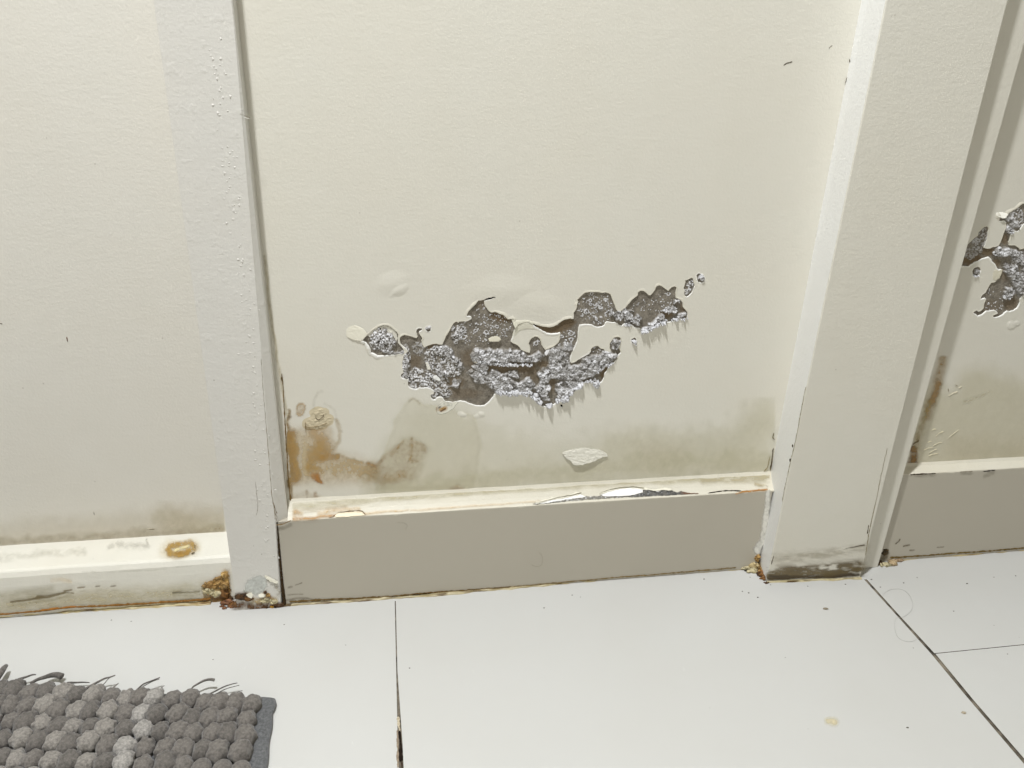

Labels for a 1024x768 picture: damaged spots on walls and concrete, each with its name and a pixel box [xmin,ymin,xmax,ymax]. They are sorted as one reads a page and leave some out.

peeling [961,202,1024,319]
peeling [346,274,703,409]
peeling [562,448,608,465]
flaking render [535,486,698,504]
corrosion [165,540,196,557]
corrosion [741,554,770,584]
leakage [766,562,864,580]
corrosion [201,571,291,610]